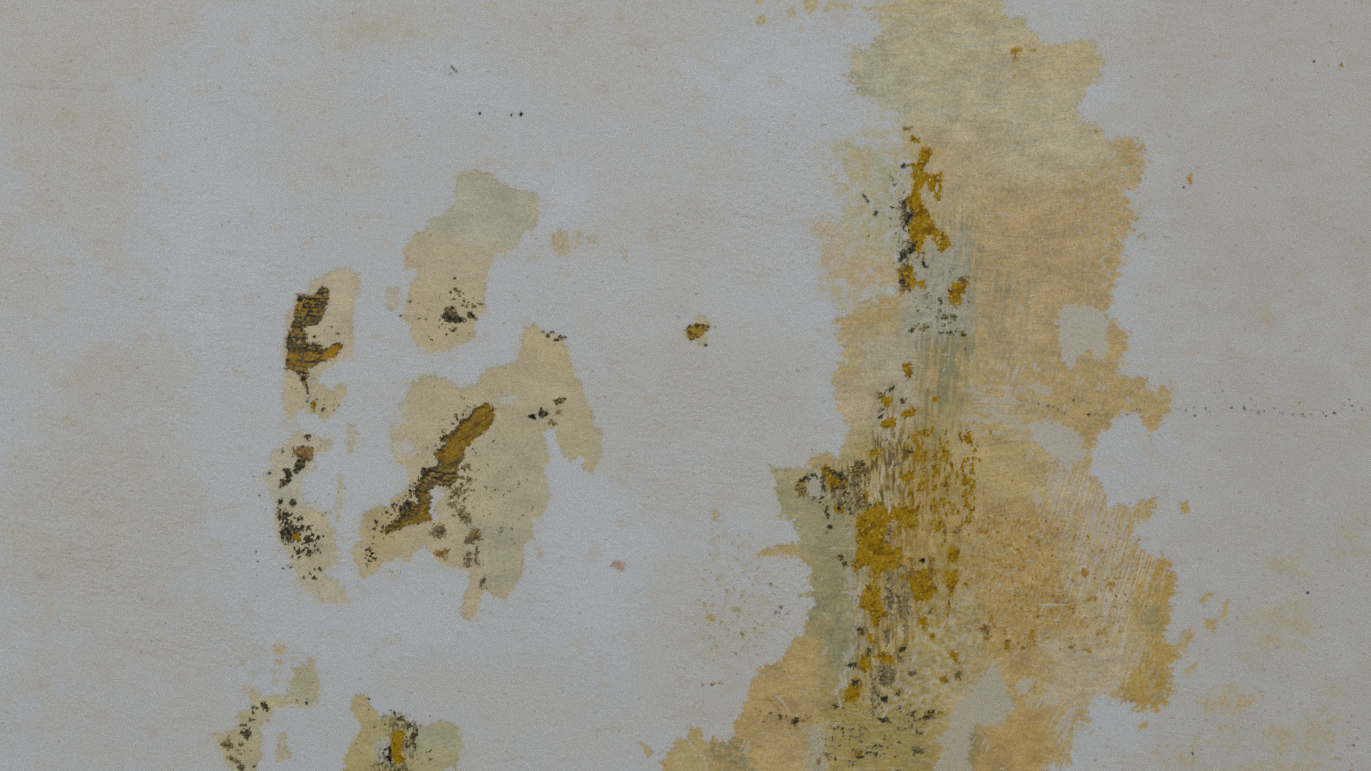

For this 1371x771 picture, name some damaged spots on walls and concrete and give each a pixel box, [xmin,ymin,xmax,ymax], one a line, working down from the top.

peeling [383,168,599,355]
peeling [255,266,605,622]
peeling [637,0,1232,771]
peeling [211,640,323,771]
peeling [342,691,463,771]